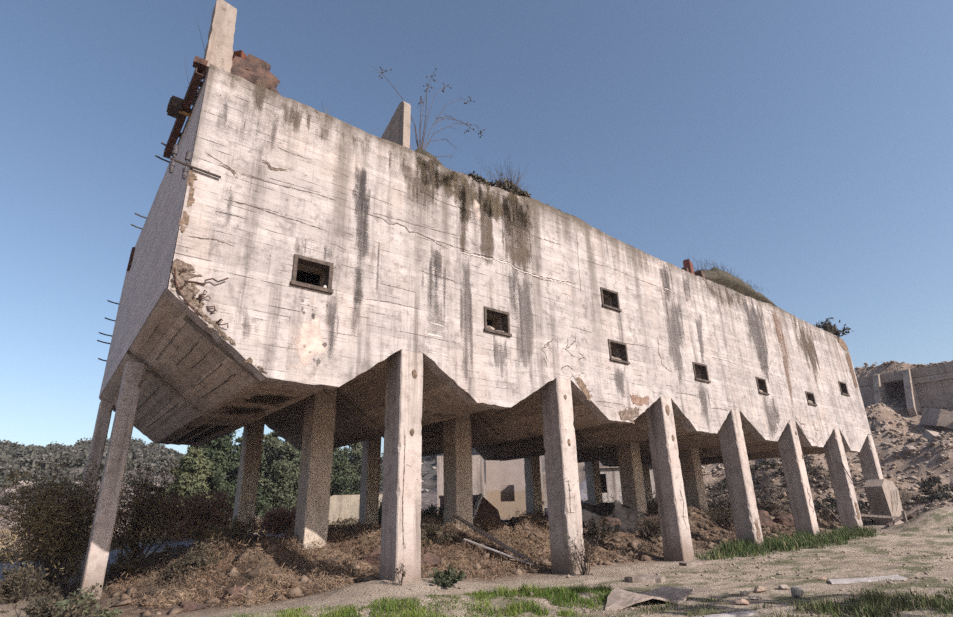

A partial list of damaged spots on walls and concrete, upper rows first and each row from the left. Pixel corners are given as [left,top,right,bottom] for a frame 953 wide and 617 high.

damp [354,171,370,281]
crack [369,212,672,291]
spalling [171,259,236,346]
damp [743,299,768,378]
damp [794,318,820,382]